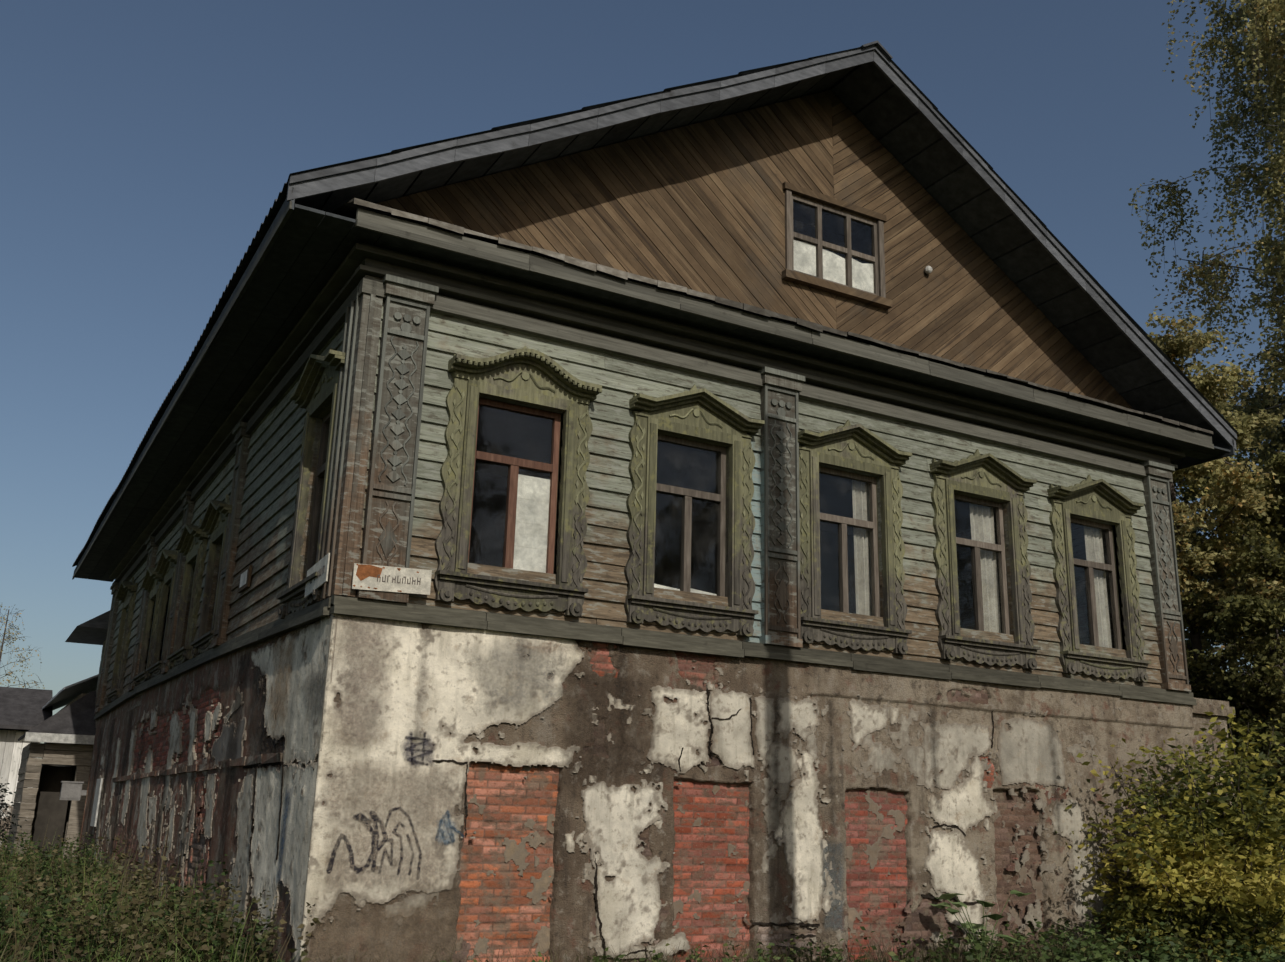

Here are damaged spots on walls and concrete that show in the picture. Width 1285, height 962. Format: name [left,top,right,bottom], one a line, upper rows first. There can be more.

peeling [109,614,848,962]
crack [678,688,754,772]
peeling [842,694,899,751]
peeling [894,709,1109,957]